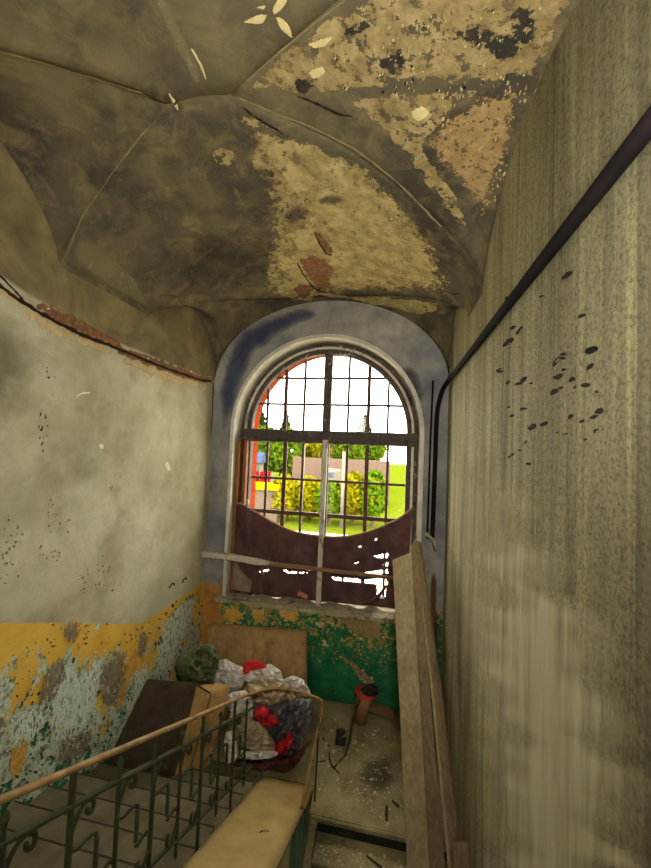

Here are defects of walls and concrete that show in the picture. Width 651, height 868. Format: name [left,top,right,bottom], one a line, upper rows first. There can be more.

peeling [238,0,571,314]
peeling [502,325,524,347]
peeling [550,352,600,395]
peeling [585,346,598,370]
peeling [568,407,604,441]
peeling [223,605,386,684]
peeling [0,592,203,788]
water stain [474,527,638,868]